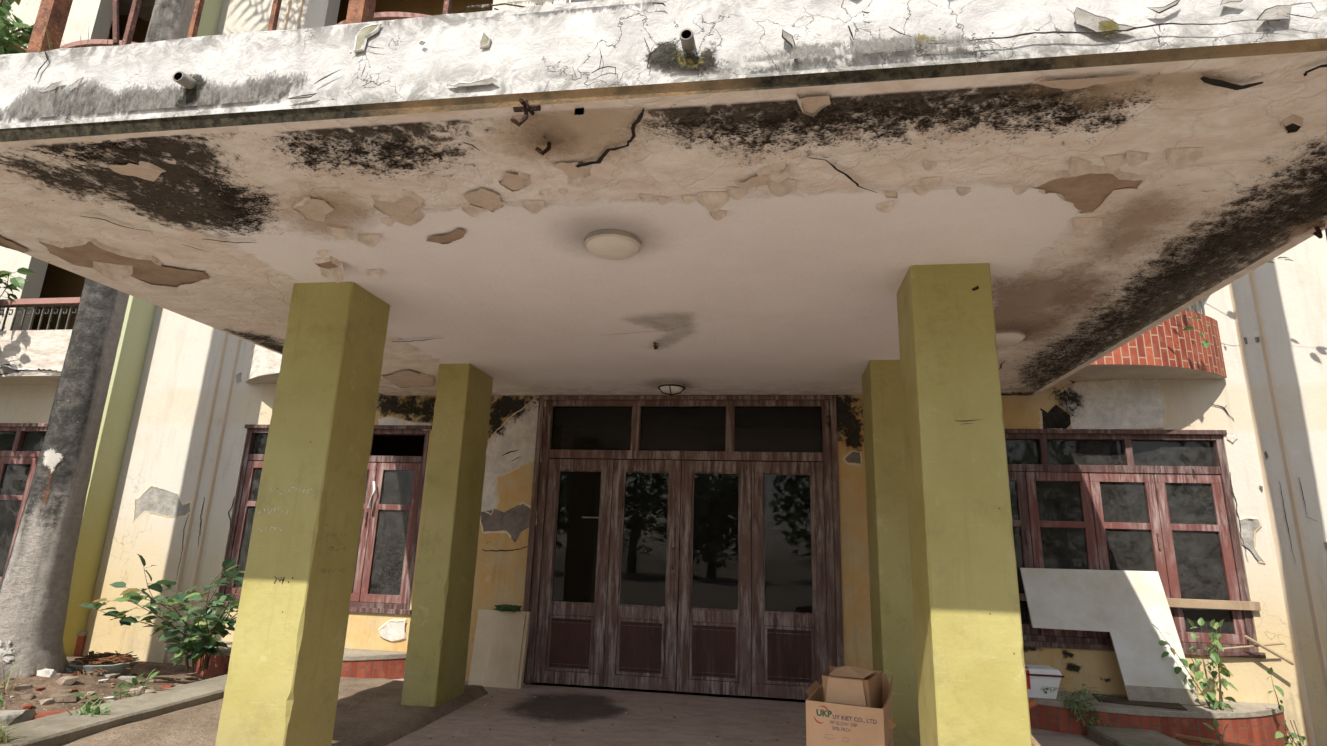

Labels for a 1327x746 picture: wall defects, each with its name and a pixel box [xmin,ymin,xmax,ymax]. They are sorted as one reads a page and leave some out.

crack [573,38,675,75]
crack [848,11,1318,45]
crack [1199,76,1264,90]
mould [257,119,495,181]
crack [576,109,644,168]
mould [628,72,1180,166]
mould [0,133,293,240]
peeling [1013,151,1148,234]
peeling [0,237,209,287]
damp [992,124,1327,420]
peeling [480,399,546,542]
peeling [132,484,192,524]